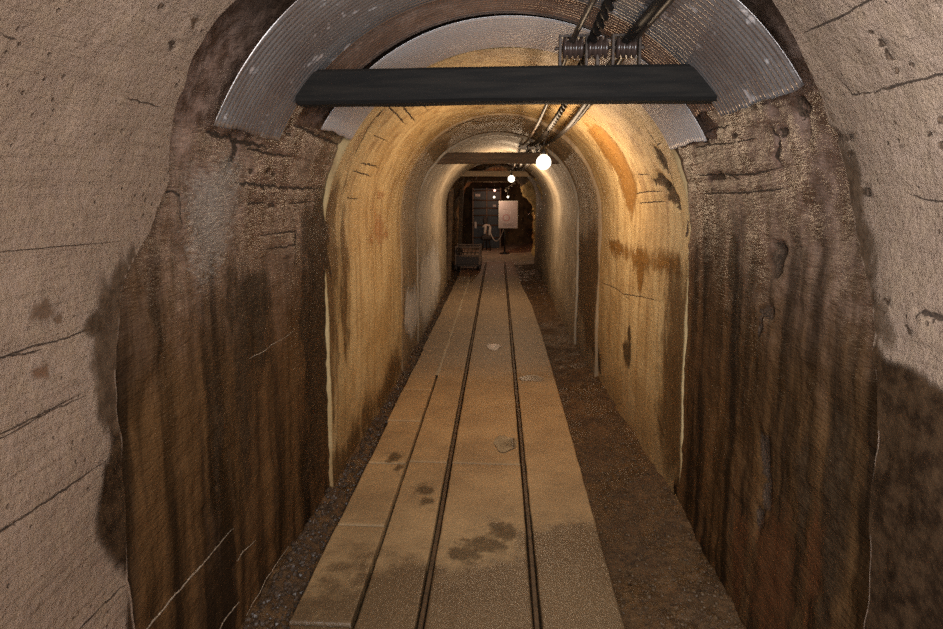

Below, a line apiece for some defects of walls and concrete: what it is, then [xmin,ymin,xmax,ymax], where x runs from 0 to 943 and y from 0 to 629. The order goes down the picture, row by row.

crack [804,0,871,33]
crack [842,73,943,95]
crack [906,192,943,202]
leakage [578,218,600,369]
crack [915,309,943,321]
crack [0,330,85,359]
leakage [609,242,687,485]
leakage [839,142,943,629]
crack [0,393,84,439]
leakage [85,248,135,570]
crack [0,458,109,533]
leakage [450,522,515,563]